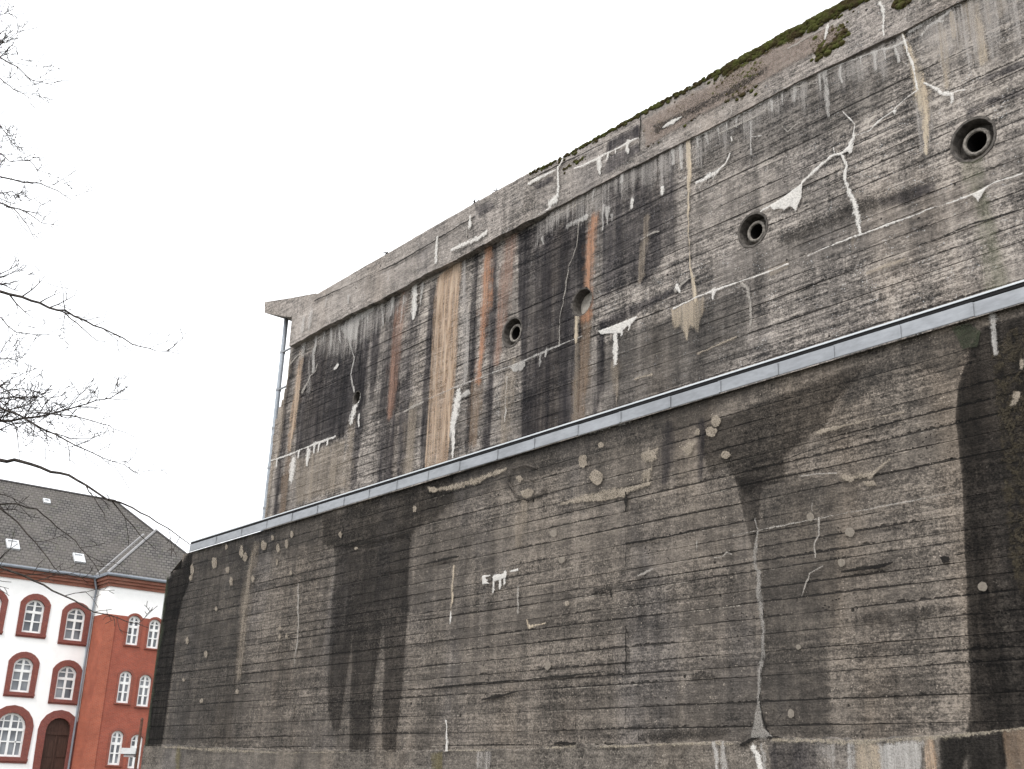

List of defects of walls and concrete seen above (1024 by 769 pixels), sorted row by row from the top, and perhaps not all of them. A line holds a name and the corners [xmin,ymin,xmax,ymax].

water stain [271,282,424,514]
corrosion [425,262,461,467]
corrosion [471,233,516,447]
water stain [446,144,683,458]
corrosion [574,307,590,417]
corrosion [585,215,597,288]
water stain [598,263,788,367]
crack [801,90,917,234]
efflorescence [787,0,1021,153]
crack [622,626,630,674]
crack [624,492,956,746]
water stain [772,312,1024,769]